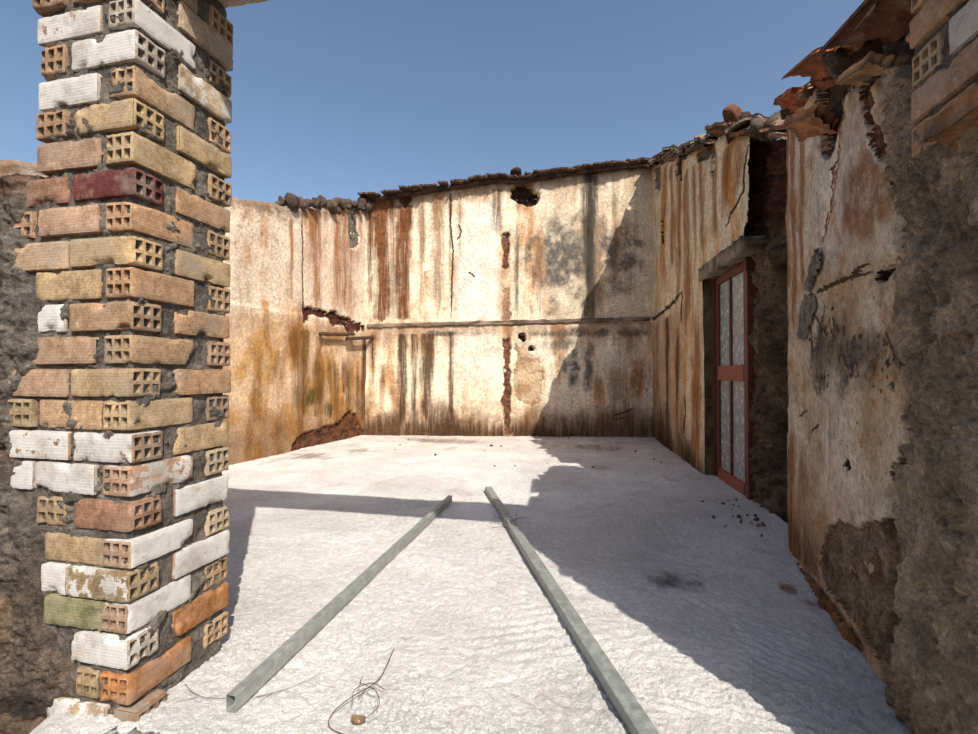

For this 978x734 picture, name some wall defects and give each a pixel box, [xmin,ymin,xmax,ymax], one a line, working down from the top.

corrosion [334,221,352,281]
corrosion [367,198,440,322]
spalling [511,185,540,207]
leakage [516,173,641,318]
corrosion [664,137,741,453]
crack [726,144,749,226]
spalling [644,75,896,524]
corrosion [785,128,804,326]
crack [821,84,853,242]
crack [810,262,873,359]
corrosion [843,151,889,238]
peeling [819,517,902,668]